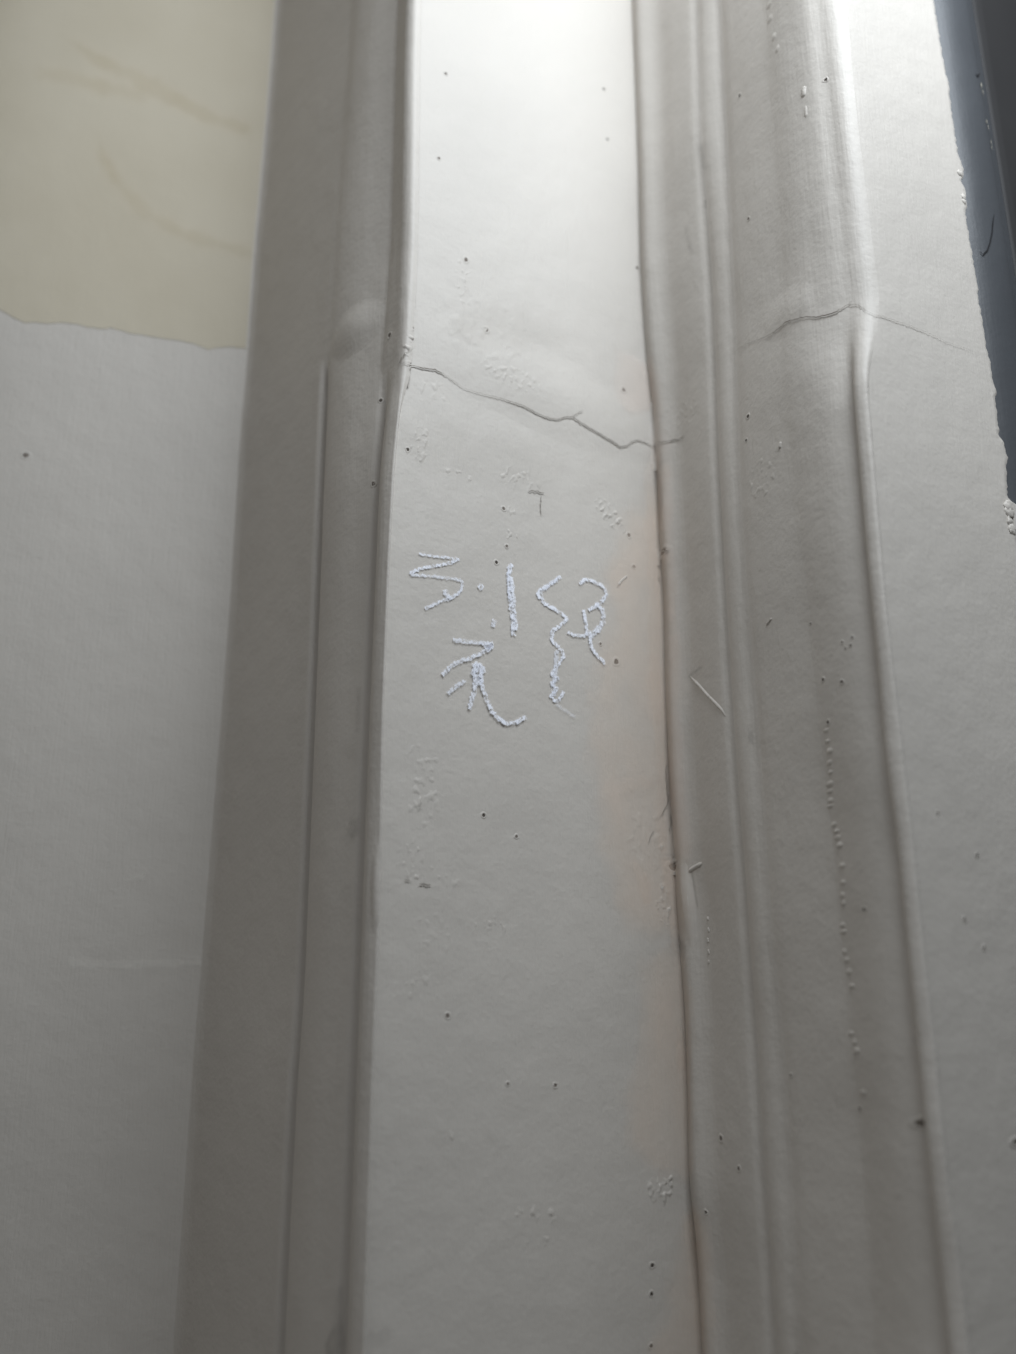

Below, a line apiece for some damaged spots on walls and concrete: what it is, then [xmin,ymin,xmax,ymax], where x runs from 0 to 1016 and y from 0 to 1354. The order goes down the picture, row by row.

crack [739,301,866,349]
crack [399,350,684,448]